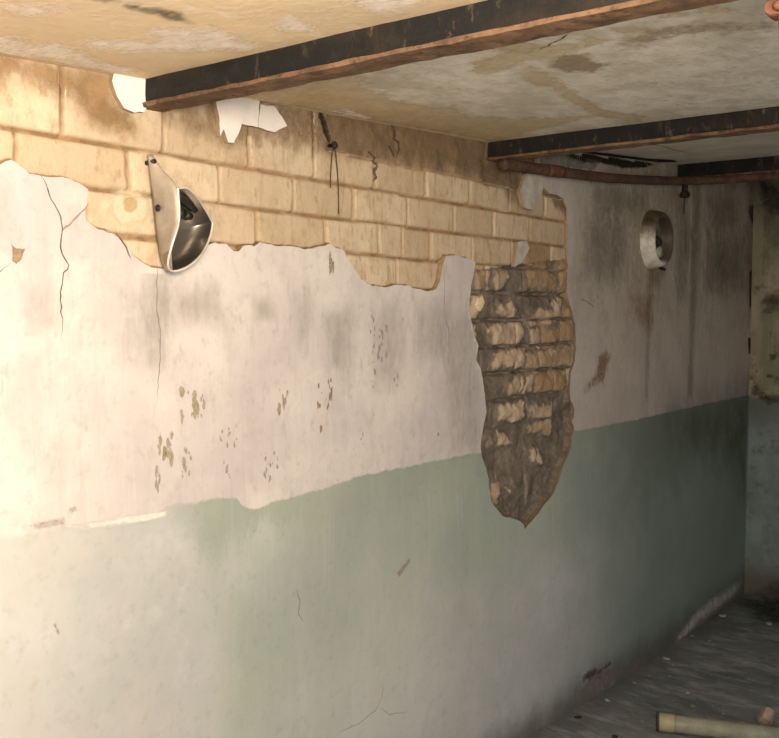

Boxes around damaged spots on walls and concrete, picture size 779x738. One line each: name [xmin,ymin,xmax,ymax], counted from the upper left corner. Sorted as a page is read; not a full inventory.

leakage [130,6,184,21]
peeling [352,0,421,13]
leakage [627,25,727,43]
leakage [552,55,602,72]
leakage [586,152,677,162]
crack [41,176,89,332]
peeling [0,27,643,524]